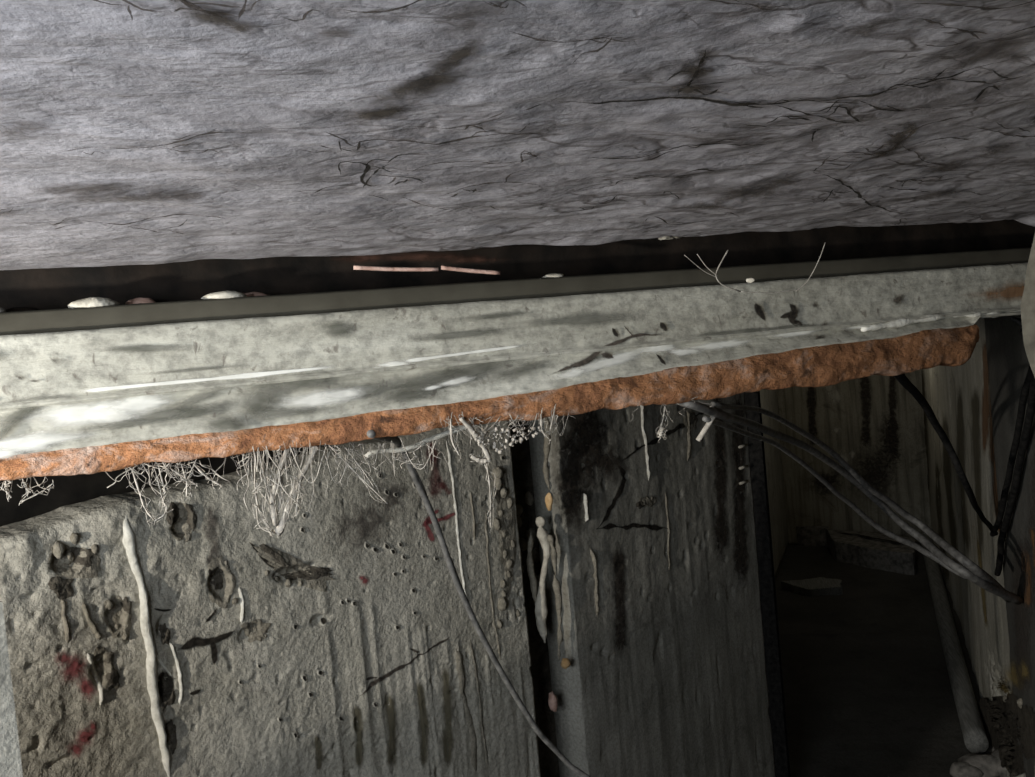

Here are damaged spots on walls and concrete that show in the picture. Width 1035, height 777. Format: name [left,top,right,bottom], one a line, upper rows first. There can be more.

crack [94,0,260,20]
crack [58,132,243,155]
crack [303,0,1035,229]
spalling [166,502,197,542]
damp [557,411,622,525]
damp [713,394,748,580]
spalling [47,533,100,600]
spalling [103,596,132,641]
spalling [208,555,237,609]
damp [526,526,563,660]
damp [613,551,626,650]
spalling [158,672,177,755]